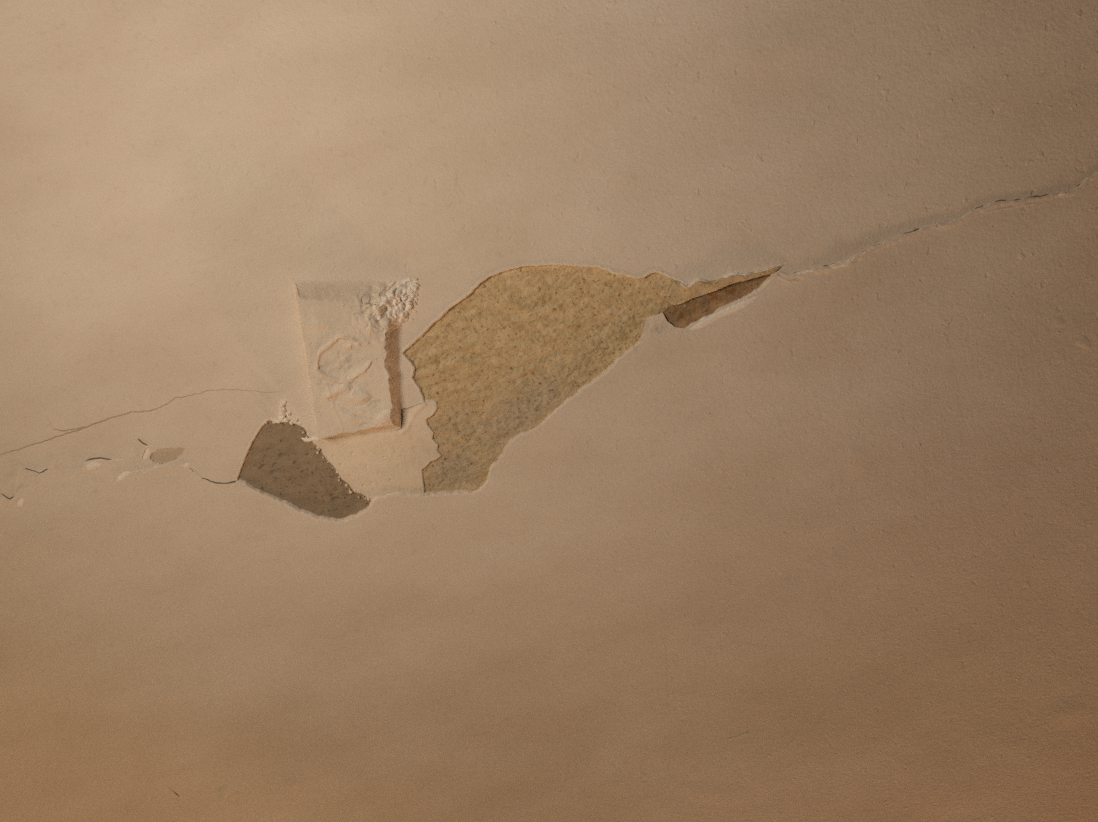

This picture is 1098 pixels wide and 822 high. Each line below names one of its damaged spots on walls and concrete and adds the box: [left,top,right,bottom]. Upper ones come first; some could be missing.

crack [662,269,778,335]
spalling [400,262,789,498]
crack [190,468,248,489]
spalling [235,400,374,524]